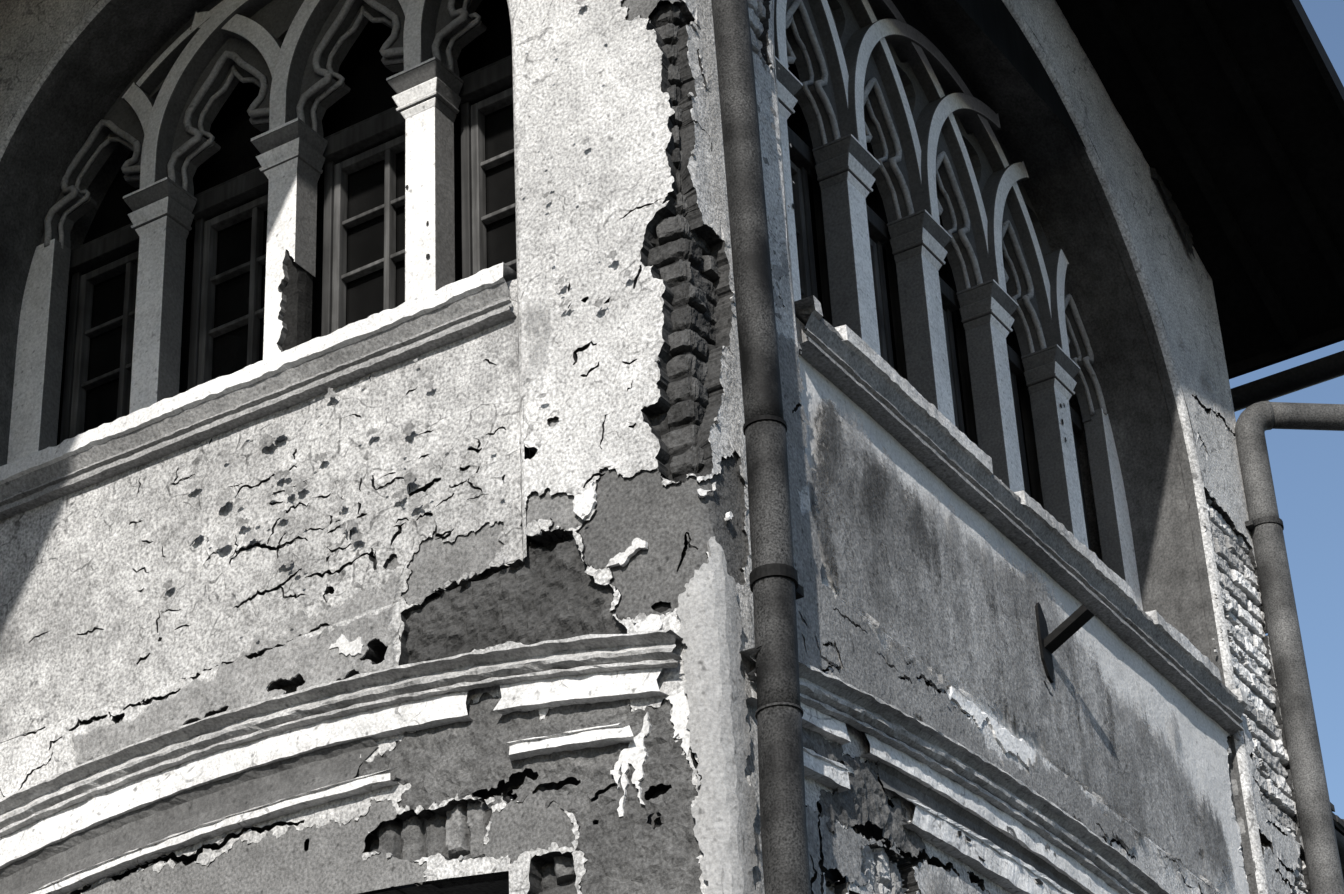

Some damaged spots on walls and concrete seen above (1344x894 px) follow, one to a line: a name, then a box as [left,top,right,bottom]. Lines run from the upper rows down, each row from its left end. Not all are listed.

flaking render [747,0,779,70]
peeling [72,0,747,763]
flaking render [82,688,704,894]
flaking render [802,727,952,894]
water stain [812,399,1237,894]
flaking render [1206,499,1308,894]